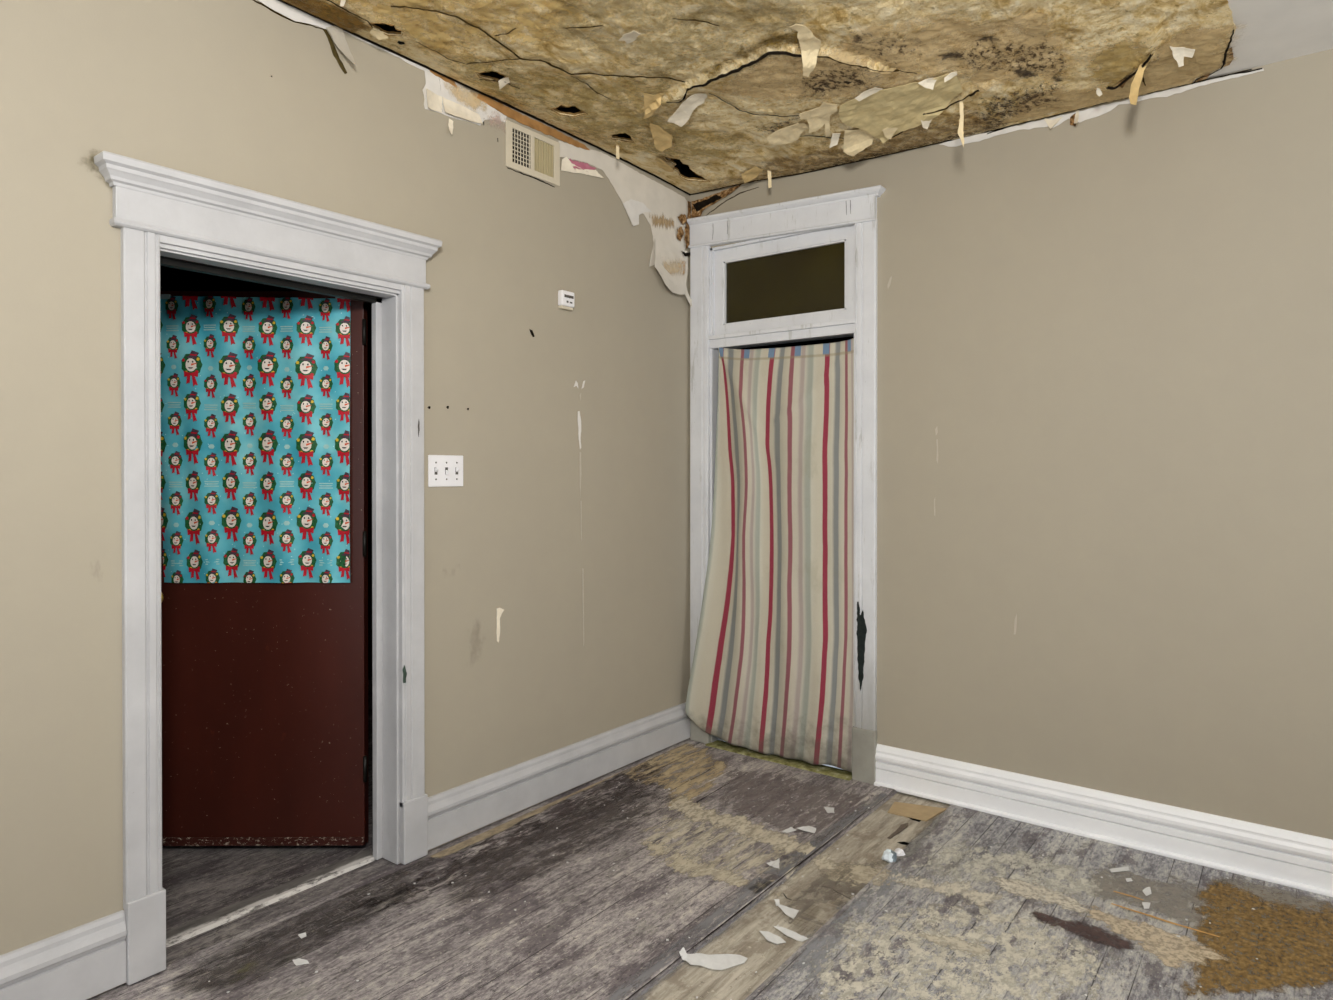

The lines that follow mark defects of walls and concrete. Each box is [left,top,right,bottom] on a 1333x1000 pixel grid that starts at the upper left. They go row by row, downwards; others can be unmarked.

peeling [258,0,772,306]
crack [253,0,980,240]
peeling [789,24,821,77]
peeling [767,102,898,156]
peeling [855,87,882,102]
peeling [918,71,957,90]
water stain [709,12,1234,188]
peeling [939,46,1264,148]
peeling [856,602,867,690]